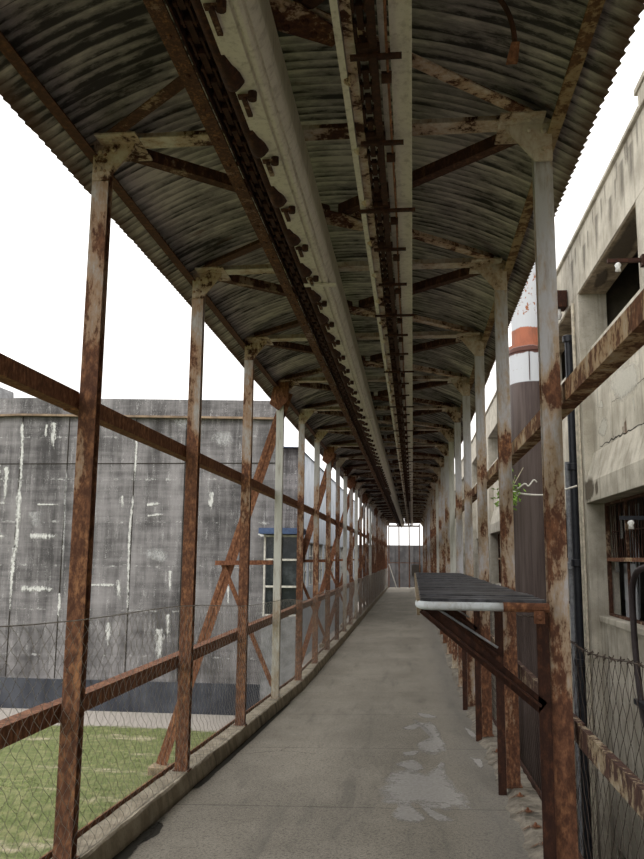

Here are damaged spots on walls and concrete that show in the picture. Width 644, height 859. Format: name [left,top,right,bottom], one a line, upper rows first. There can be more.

damp [0,423,61,616]